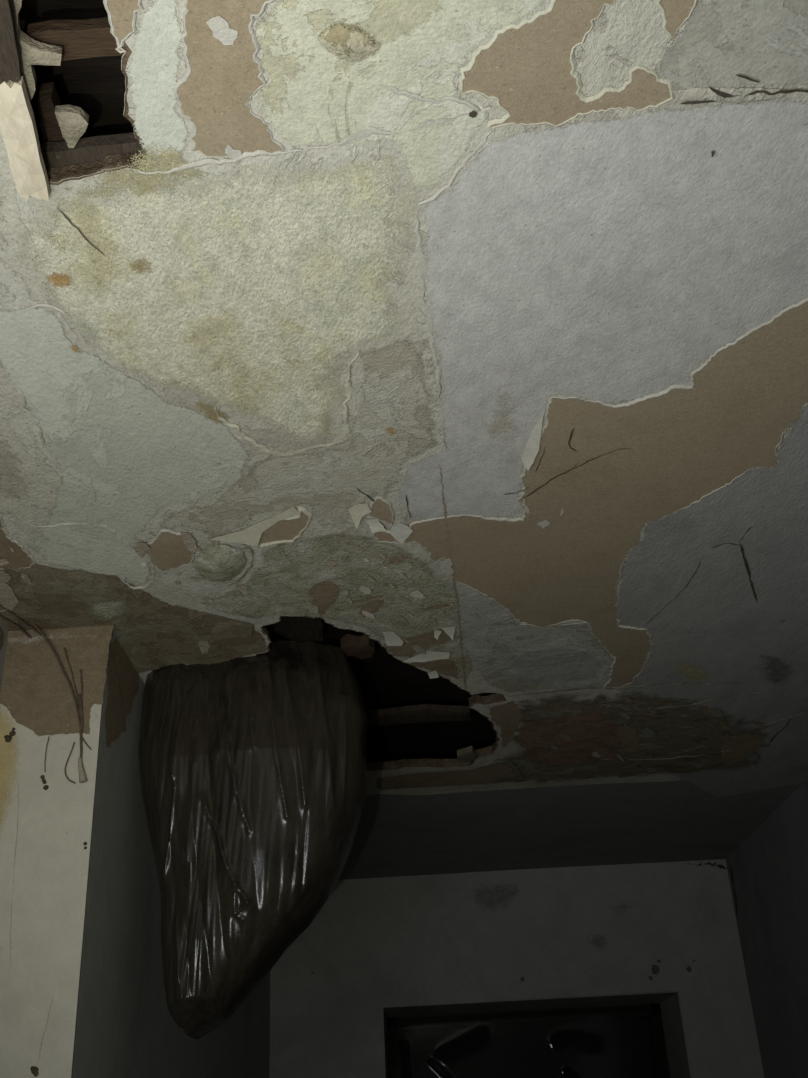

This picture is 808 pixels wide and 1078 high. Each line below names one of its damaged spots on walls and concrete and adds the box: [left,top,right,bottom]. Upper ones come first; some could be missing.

peeling [655,0,698,40]
peeling [103,0,285,160]
peeling [458,0,675,130]
crack [681,74,808,104]
crack [504,428,621,499]
peeling [348,297,808,691]
peeling [308,581,339,617]
peeling [377,763,512,790]